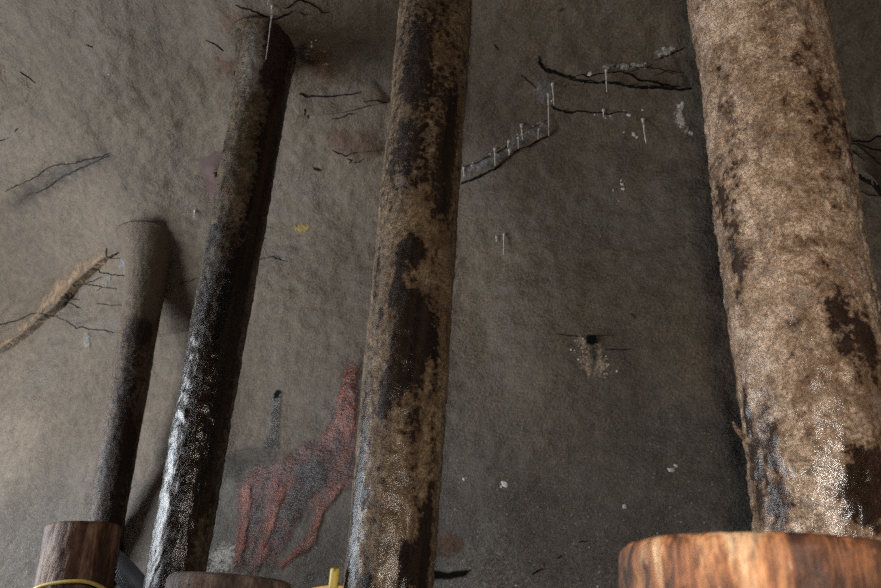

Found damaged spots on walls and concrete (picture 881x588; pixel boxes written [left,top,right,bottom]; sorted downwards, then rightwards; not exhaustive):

crack [235,0,330,20]
crack [522,48,690,91]
crack [460,105,628,185]
leakage [674,101,693,135]
crack [851,135,881,197]
corrosion [233,362,360,574]